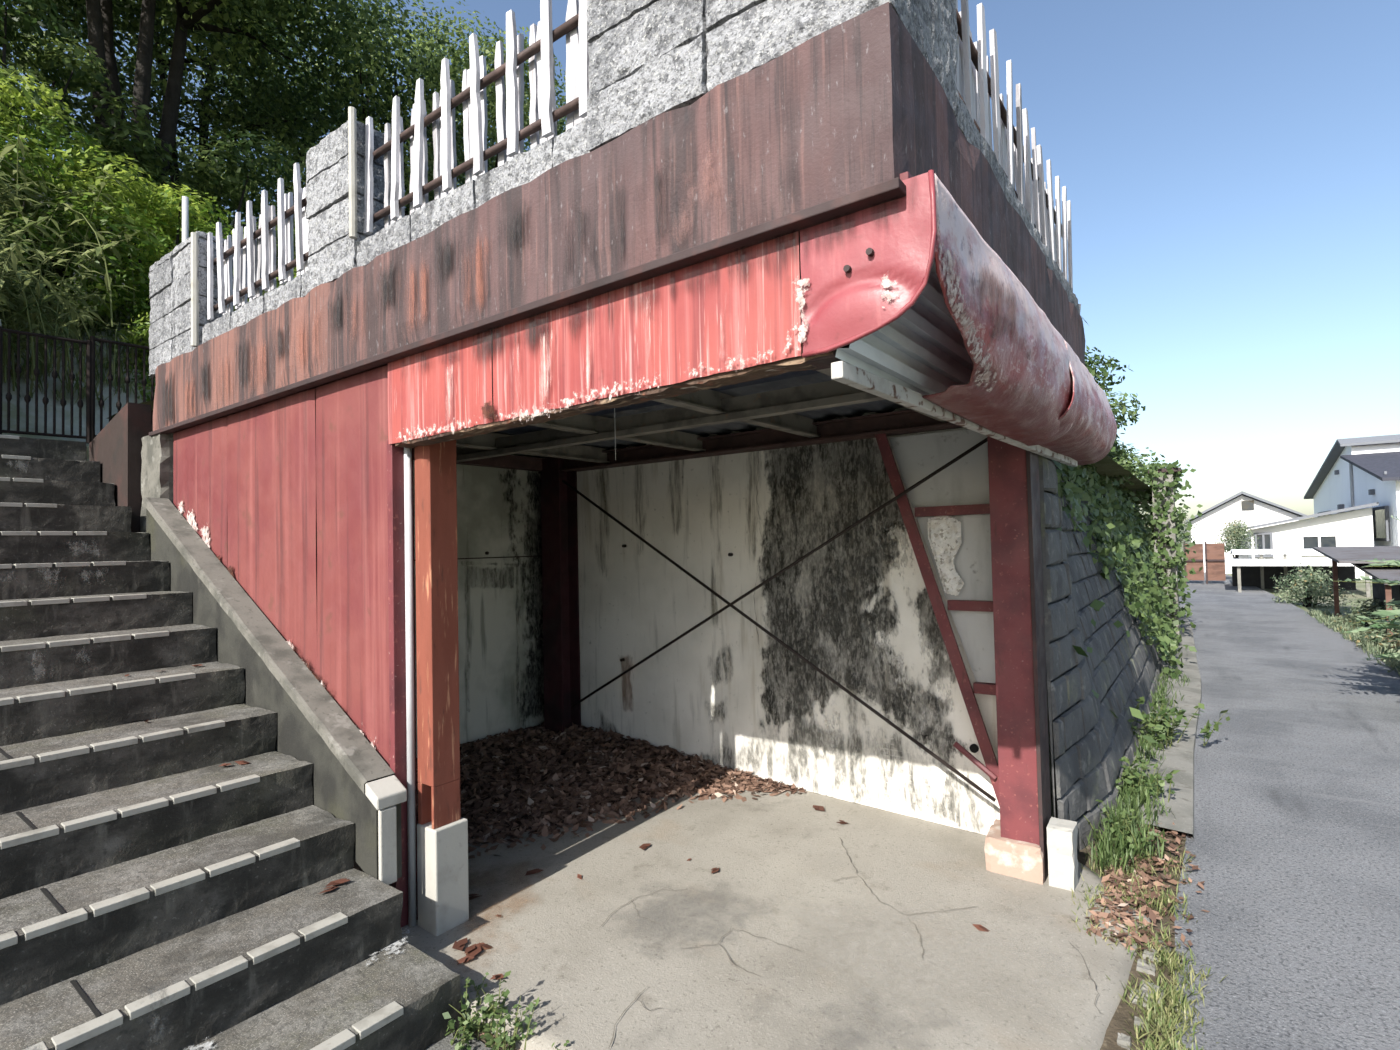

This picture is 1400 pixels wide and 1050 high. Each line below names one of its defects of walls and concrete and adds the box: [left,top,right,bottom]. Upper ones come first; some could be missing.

corrosion [409,271,426,321]
peeling [689,278,810,376]
peeling [881,274,898,308]
peeling [397,420,478,441]
peeling [499,375,660,421]
spalling [927,516,964,596]
leakage [500,469,544,725]
leakage [703,438,983,832]
crack [833,838,977,958]